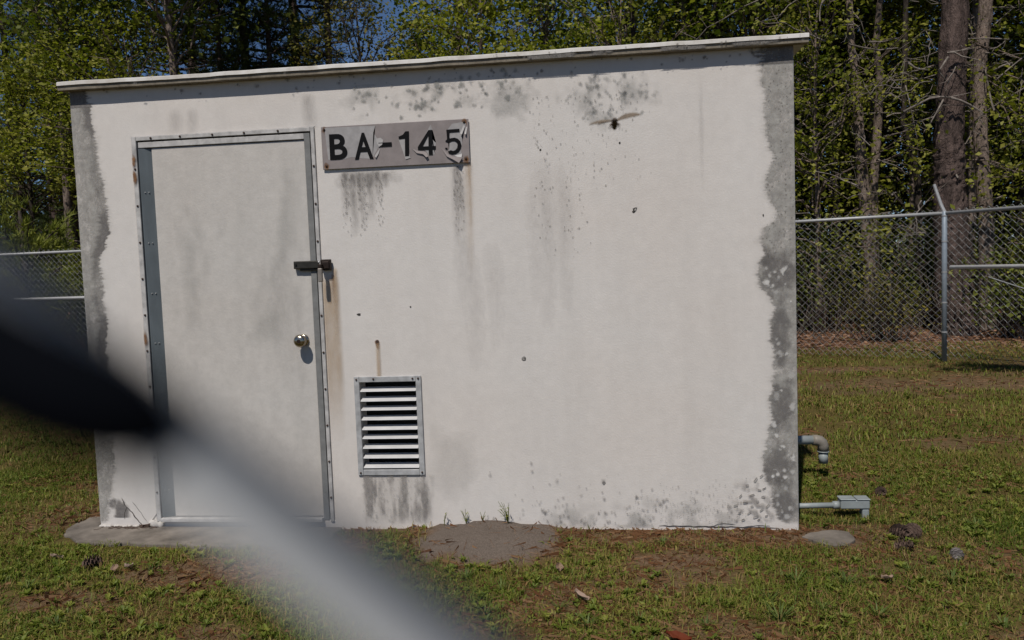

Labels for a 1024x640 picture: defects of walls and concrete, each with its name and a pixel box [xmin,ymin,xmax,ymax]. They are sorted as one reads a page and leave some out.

water stain [69,91,110,334]
rust [323,270,336,343]
water stain [721,37,803,521]
water stain [96,465,128,521]
water stain [363,475,428,518]